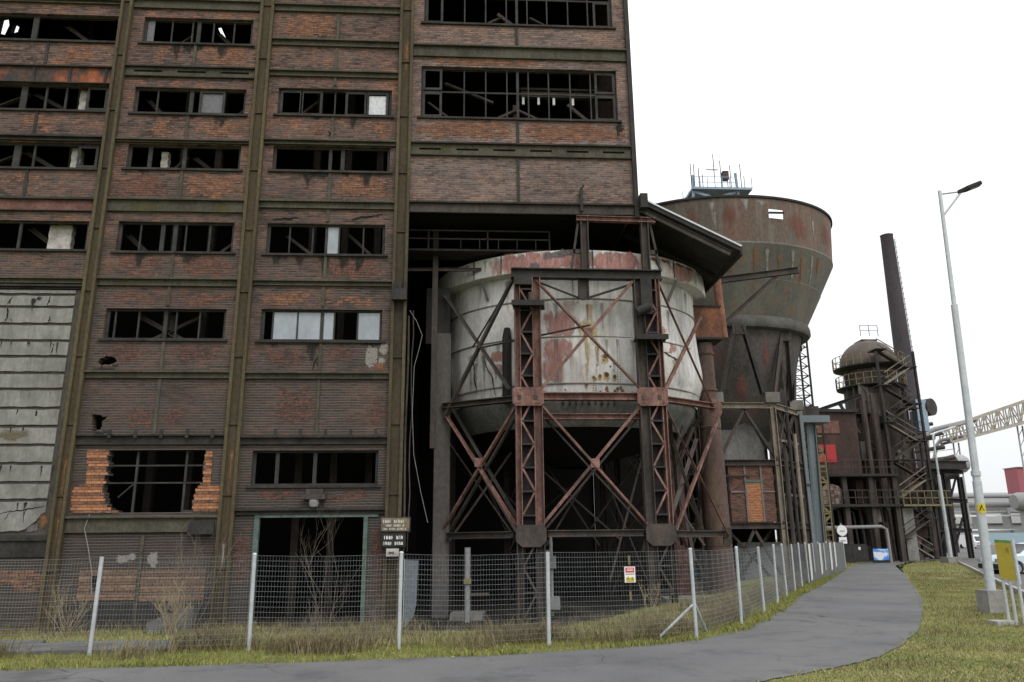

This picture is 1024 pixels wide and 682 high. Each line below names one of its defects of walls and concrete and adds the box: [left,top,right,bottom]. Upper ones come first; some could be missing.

spalling [102,342,222,362]
flaking render [328,343,388,370]
corrosion [579,305,624,392]
flaking render [70,449,118,513]
flaking render [192,451,220,512]
crack [0,506,43,521]